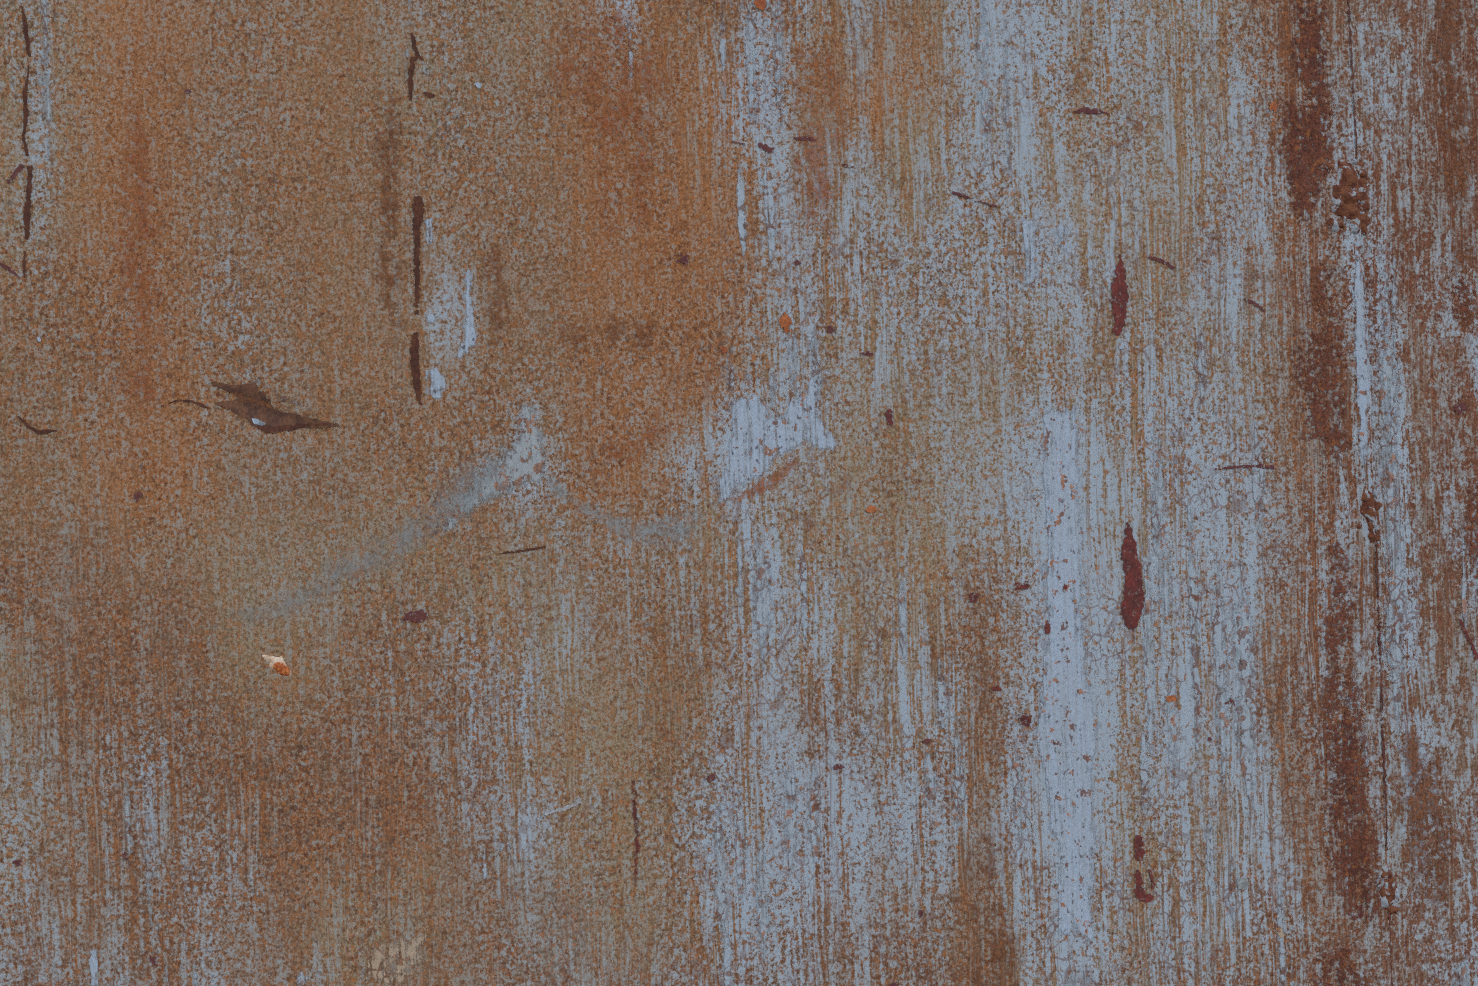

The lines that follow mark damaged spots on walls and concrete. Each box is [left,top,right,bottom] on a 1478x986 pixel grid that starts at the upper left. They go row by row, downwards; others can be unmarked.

peeling [736,152,775,262]
peeling [717,325,837,505]
peeling [1110,250,1130,349]
corrosion [1269,0,1336,232]
corrosion [1288,262,1352,465]
corrosion [1348,0,1358,159]
corrosion [1429,0,1476,327]
corrosion [632,781,641,886]
peeling [1012,406,1100,941]
peeling [1134,835,1155,902]
peeling [1121,420,1255,811]
corrosion [1313,542,1457,986]